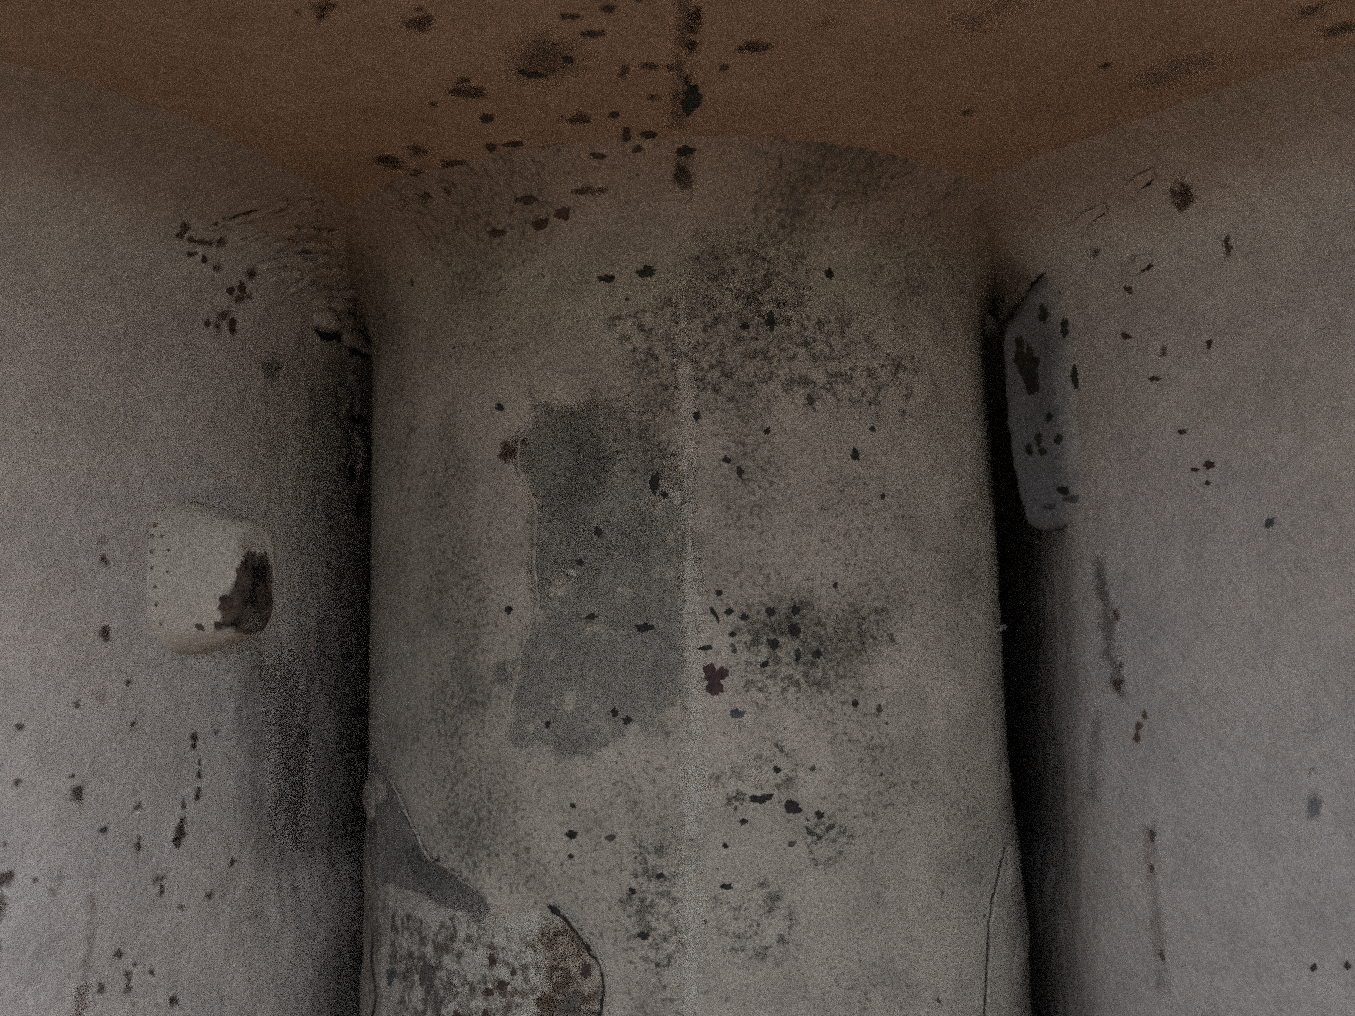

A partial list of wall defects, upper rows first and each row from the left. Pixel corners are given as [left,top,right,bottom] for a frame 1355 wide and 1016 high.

spalling [195,552,274,635]
damp [608,246,914,1016]
spalling [368,755,610,1016]
damp [564,830,577,859]
crack [984,838,1009,1016]